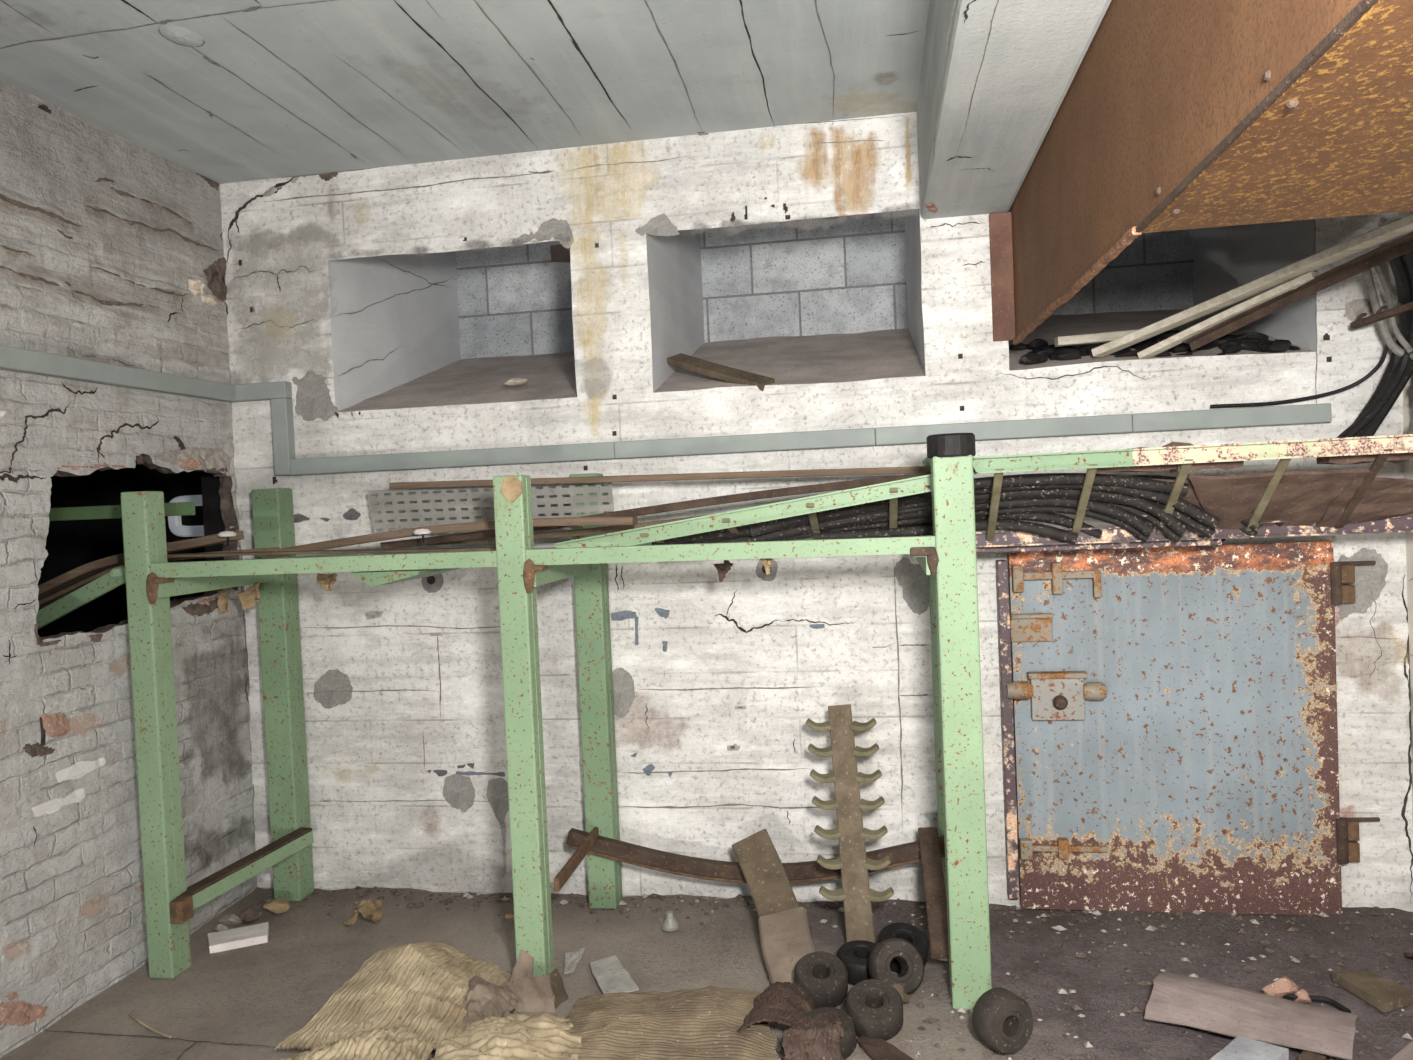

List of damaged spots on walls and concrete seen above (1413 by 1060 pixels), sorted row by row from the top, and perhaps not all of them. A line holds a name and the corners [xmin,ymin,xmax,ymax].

crack [121,0,157,23]
crack [394,0,535,145]
crack [547,0,631,129]
crack [739,0,775,127]
rust [804,133,872,212]
crack [220,176,317,331]
crack [0,382,98,483]
crack [96,416,159,463]
spalling [183,595,219,617]
crack [715,589,849,633]
spalling [23,706,99,758]
crack [1365,575,1413,903]